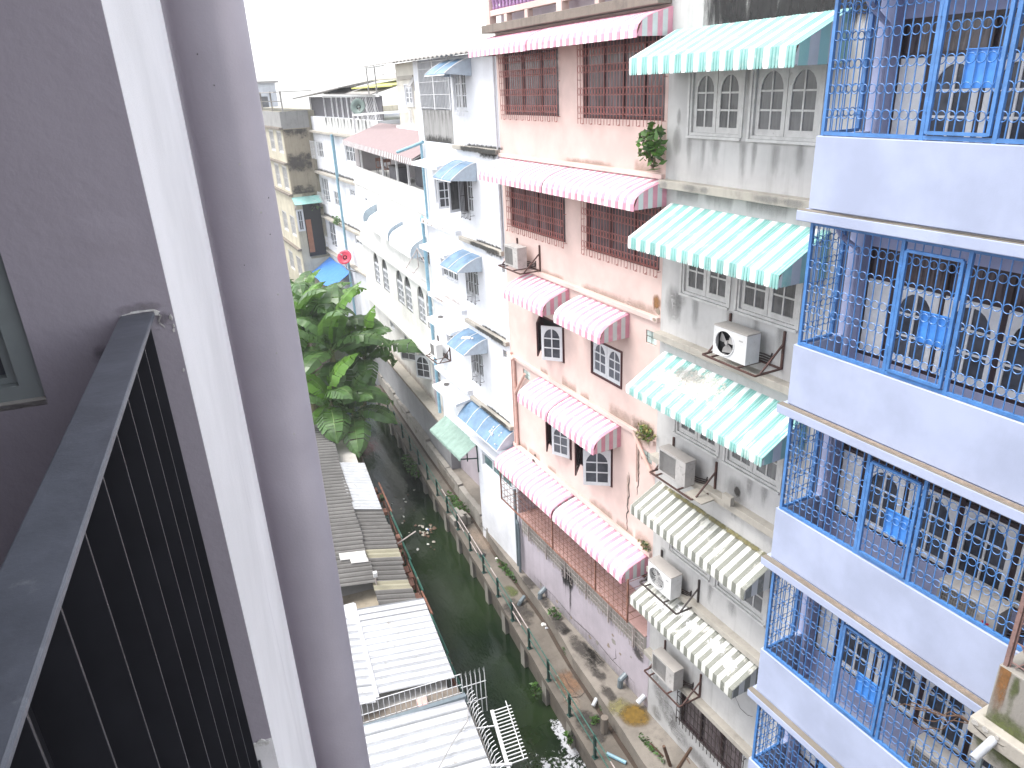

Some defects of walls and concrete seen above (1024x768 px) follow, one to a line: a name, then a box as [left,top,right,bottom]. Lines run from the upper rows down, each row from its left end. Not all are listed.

spalling [122,309,175,332]
crack [626,453,639,529]